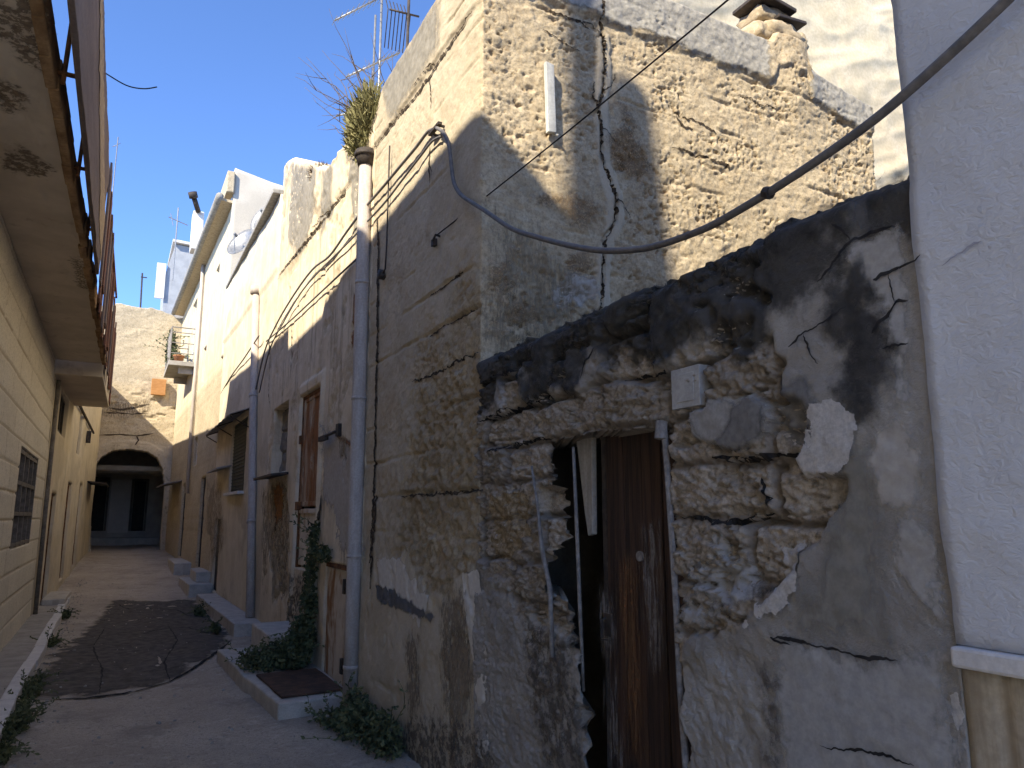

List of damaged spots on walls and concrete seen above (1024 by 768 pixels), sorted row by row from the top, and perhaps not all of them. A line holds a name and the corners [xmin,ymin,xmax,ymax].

crack [541,0,630,310]
crack [817,223,895,282]
damp [484,175,906,423]
crack [788,307,845,364]
damp [777,378,815,446]
peeling [796,397,857,482]
peeling [742,540,807,629]
crack [770,636,897,662]
crack [822,746,914,766]